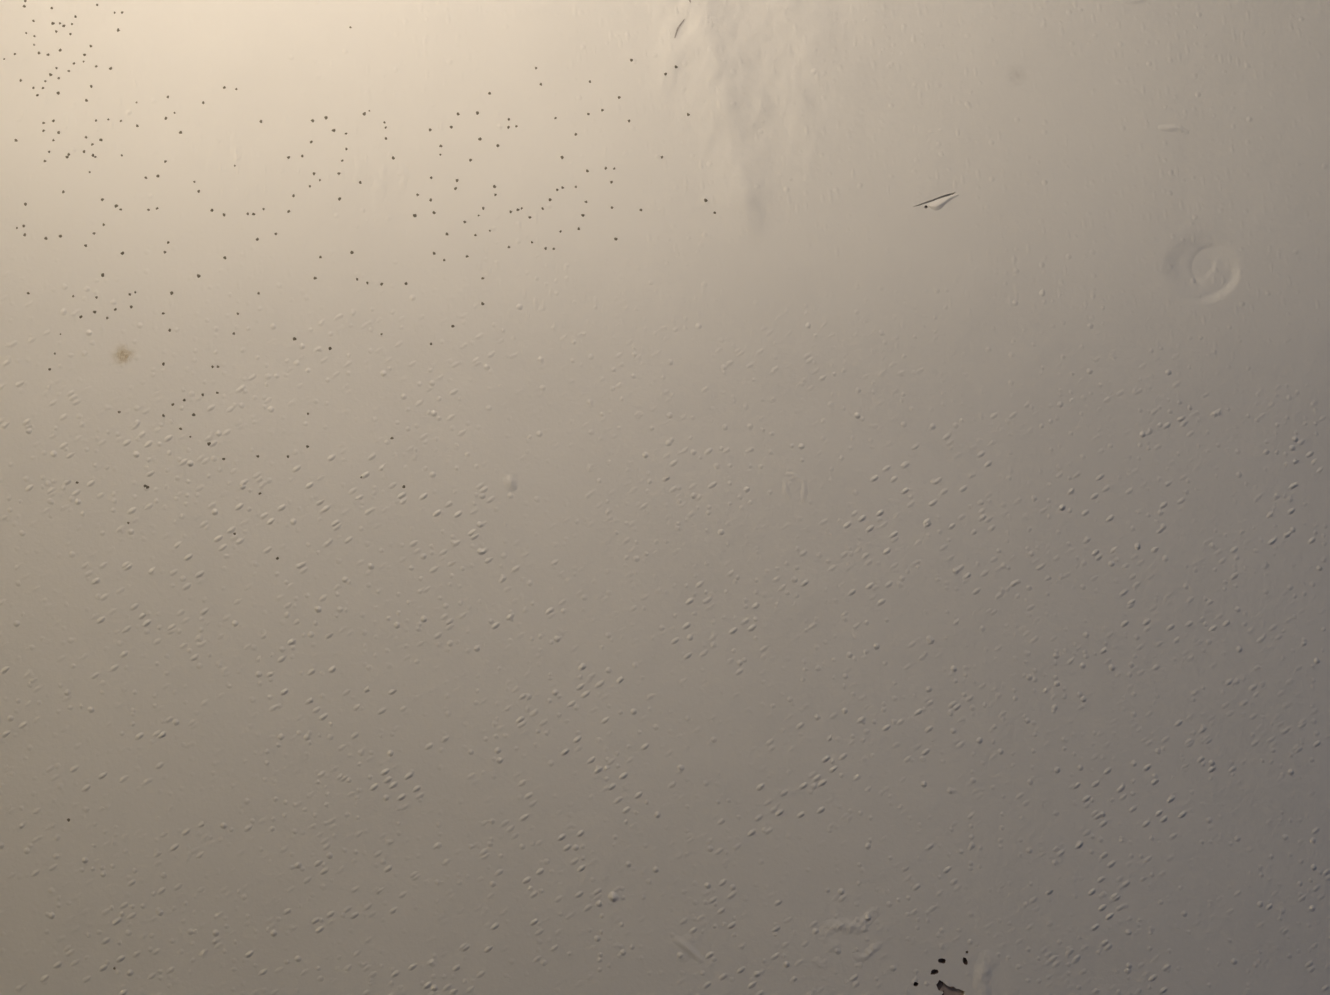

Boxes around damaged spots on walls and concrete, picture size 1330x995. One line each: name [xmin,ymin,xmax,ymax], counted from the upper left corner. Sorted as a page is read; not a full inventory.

peeling [931,958,965,995]